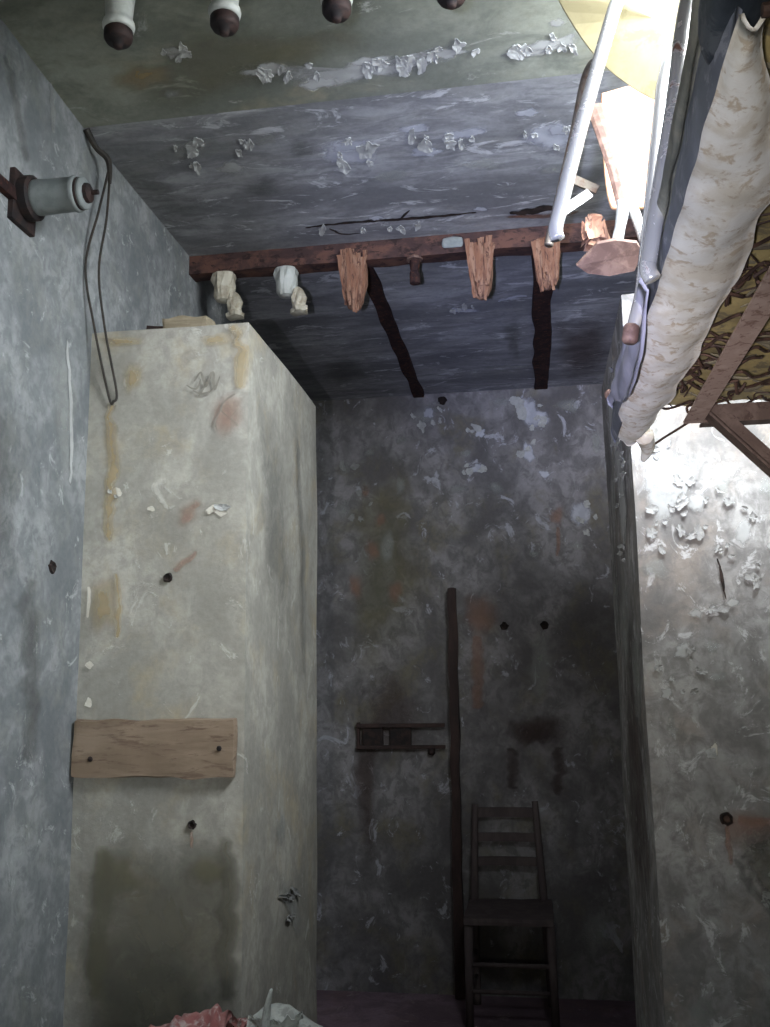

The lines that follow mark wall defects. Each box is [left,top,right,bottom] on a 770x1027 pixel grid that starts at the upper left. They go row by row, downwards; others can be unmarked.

peeling [244,38,480,90]
peeling [173,137,204,175]
peeling [218,138,254,173]
peeling [325,137,380,174]
peeling [400,124,485,156]
peeling [645,440,758,558]
peeling [744,563,762,589]
peeling [690,599,739,617]
water stain [91,841,238,1027]